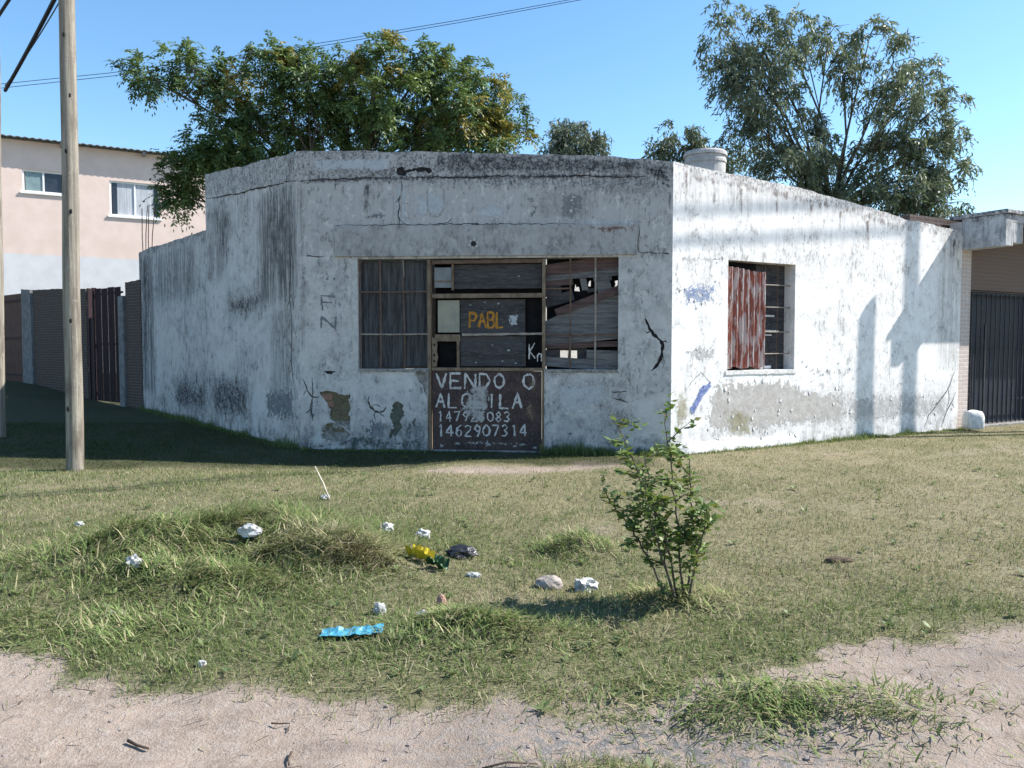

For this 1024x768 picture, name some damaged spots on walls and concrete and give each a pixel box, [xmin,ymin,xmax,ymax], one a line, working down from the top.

crack [208,171,644,420]
crack [645,318,667,371]
leakage [175,374,247,419]
spalling [319,391,351,443]
spalling [365,401,406,439]
crack [925,374,955,427]